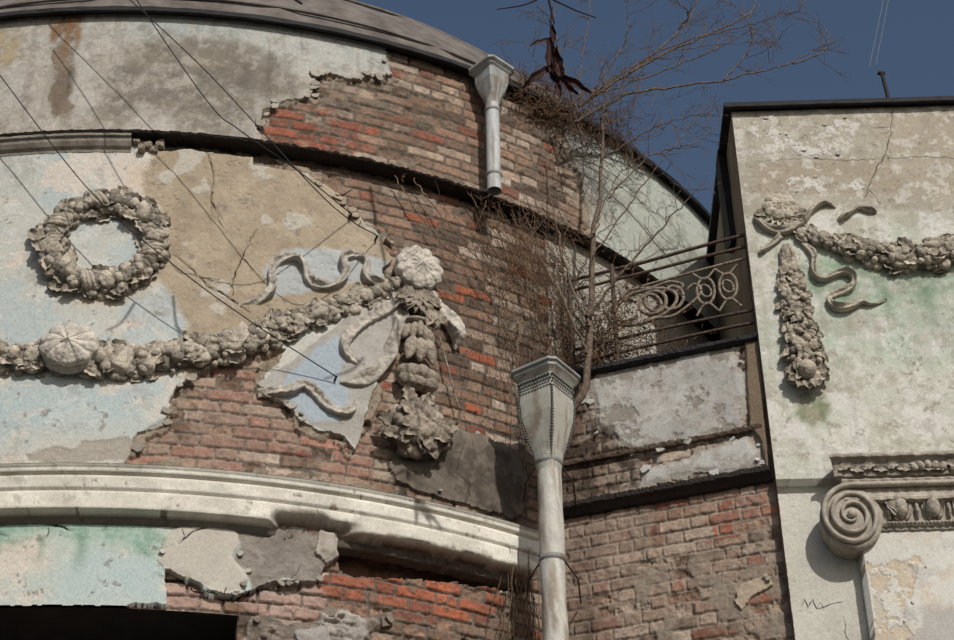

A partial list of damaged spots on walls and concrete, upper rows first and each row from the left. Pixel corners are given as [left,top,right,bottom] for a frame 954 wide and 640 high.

damp [48,36,74,117]
flaking render [255,51,591,238]
crack [753,118,954,204]
crack [179,232,255,310]
flaking render [125,154,568,542]
flaking render [581,346,765,489]
flaking render [236,530,543,640]
crack [802,599,849,640]
peeling [865,561,914,640]